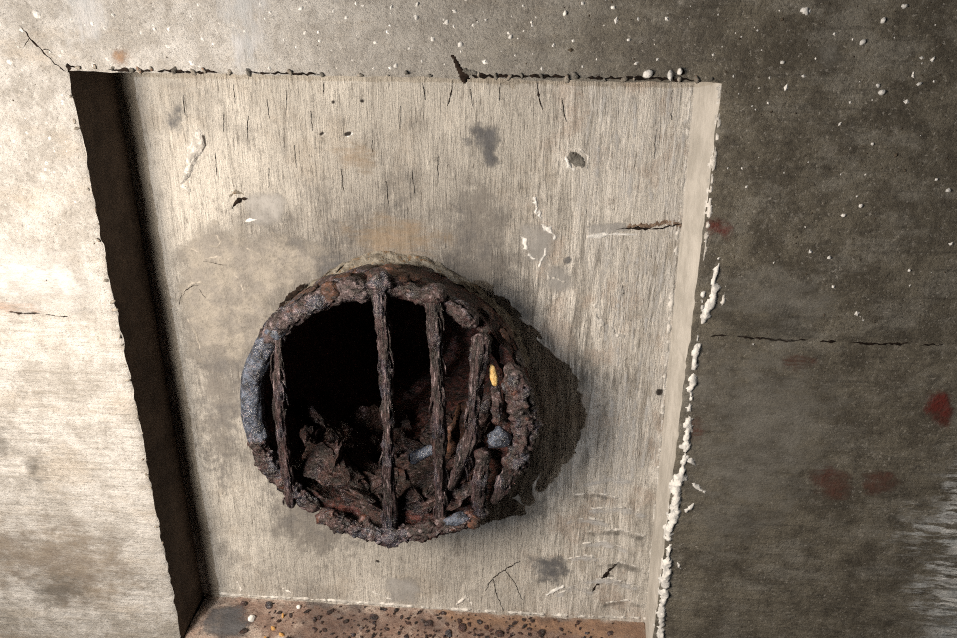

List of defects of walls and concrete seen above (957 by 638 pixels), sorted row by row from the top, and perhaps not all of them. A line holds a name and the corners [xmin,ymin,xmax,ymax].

rust [488,349,498,387]
leakage [911,474,957,638]
rust [438,610,646,638]